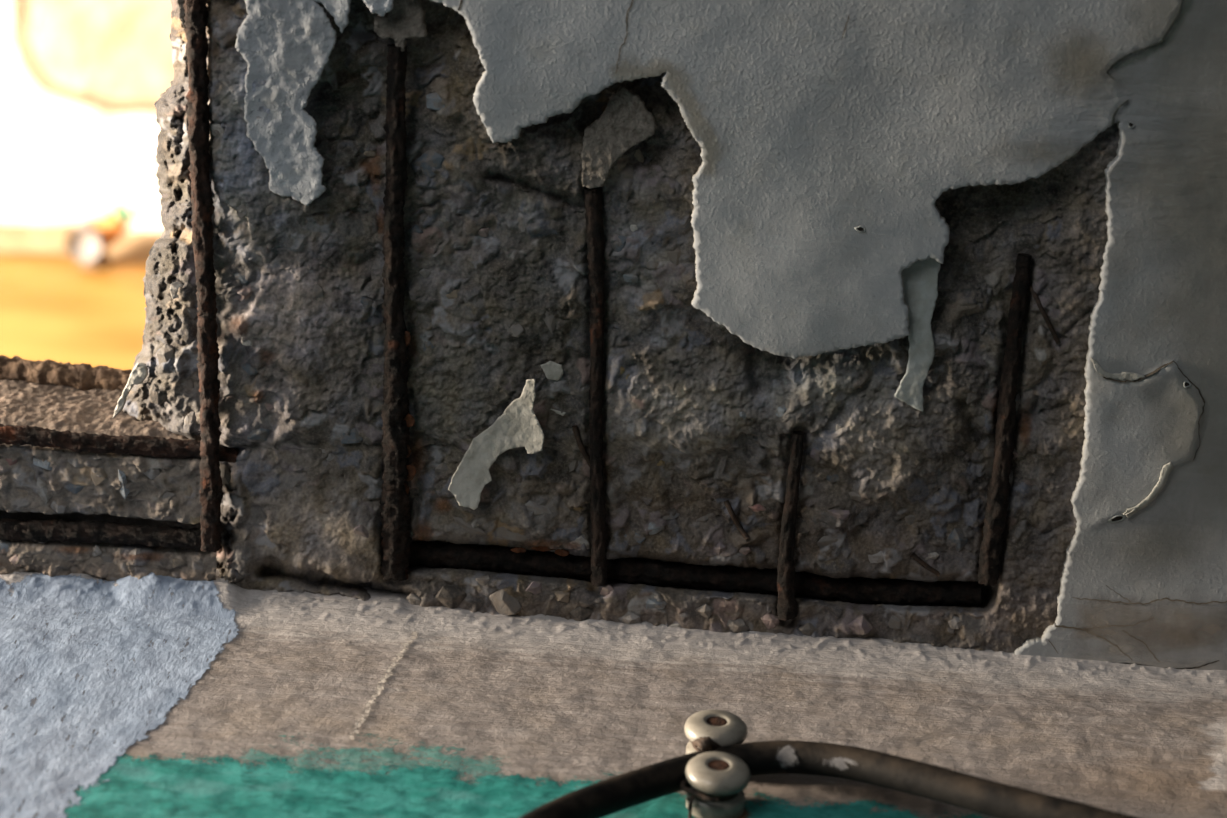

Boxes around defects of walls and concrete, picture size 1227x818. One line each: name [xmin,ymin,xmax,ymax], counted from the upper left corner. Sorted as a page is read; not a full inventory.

crack [615,0,633,74]
crack [1106,0,1183,125]
spalling [0,0,1145,653]
crack [1103,361,1205,460]
crack [1048,585,1227,669]